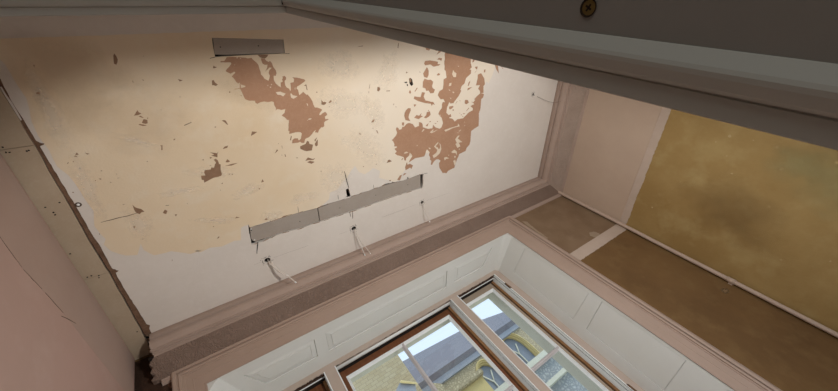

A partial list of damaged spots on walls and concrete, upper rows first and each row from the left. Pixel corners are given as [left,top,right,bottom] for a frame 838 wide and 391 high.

peeling [0,27,503,391]